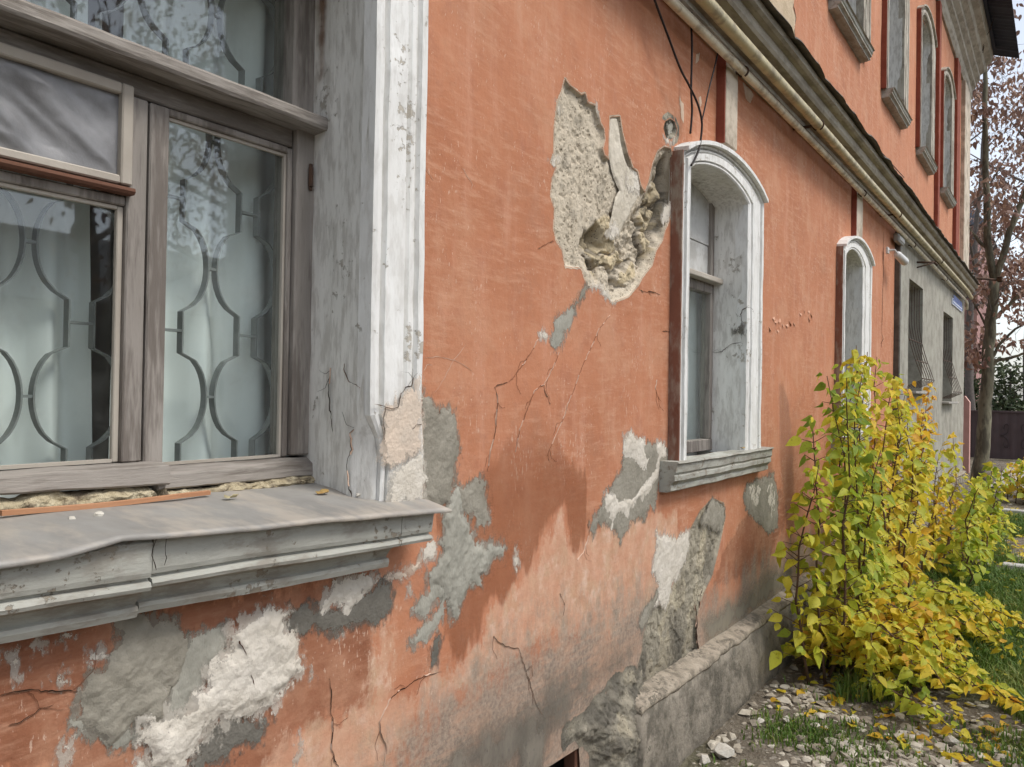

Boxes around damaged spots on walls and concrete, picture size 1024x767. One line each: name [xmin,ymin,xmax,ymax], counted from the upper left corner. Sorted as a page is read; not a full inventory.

spalling [550,77,684,305]
crack [319,364,415,497]
spalling [380,376,429,502]
crack [485,315,610,470]
spalling [637,497,726,682]
crack [1,648,98,725]
crack [493,636,543,717]